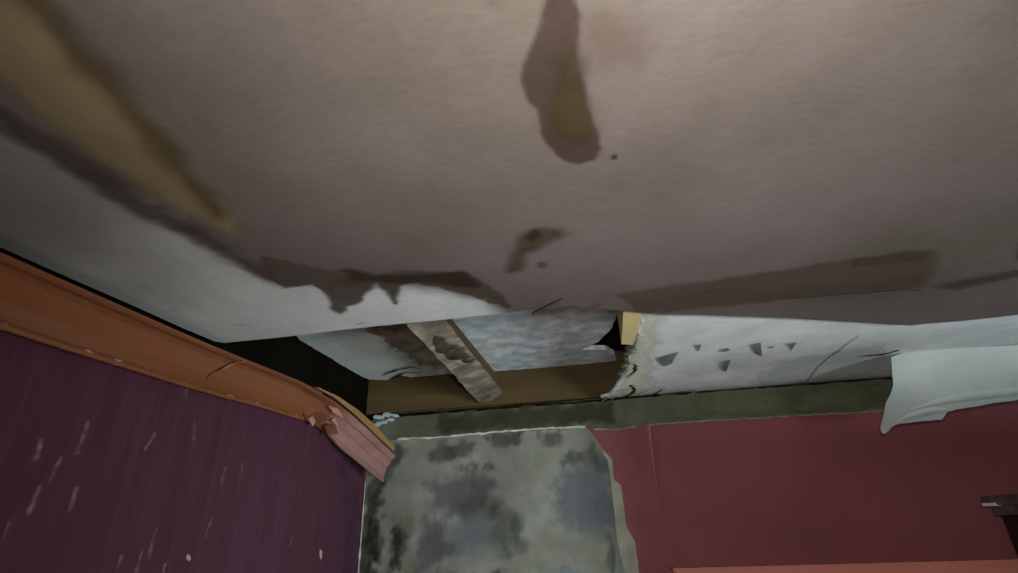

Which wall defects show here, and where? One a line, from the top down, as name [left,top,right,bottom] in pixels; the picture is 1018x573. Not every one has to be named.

damp [0,0,510,313]
damp [523,0,600,163]
damp [622,252,936,312]
peeling [308,406,344,437]
damp [439,402,614,433]
peeling [359,321,1018,573]